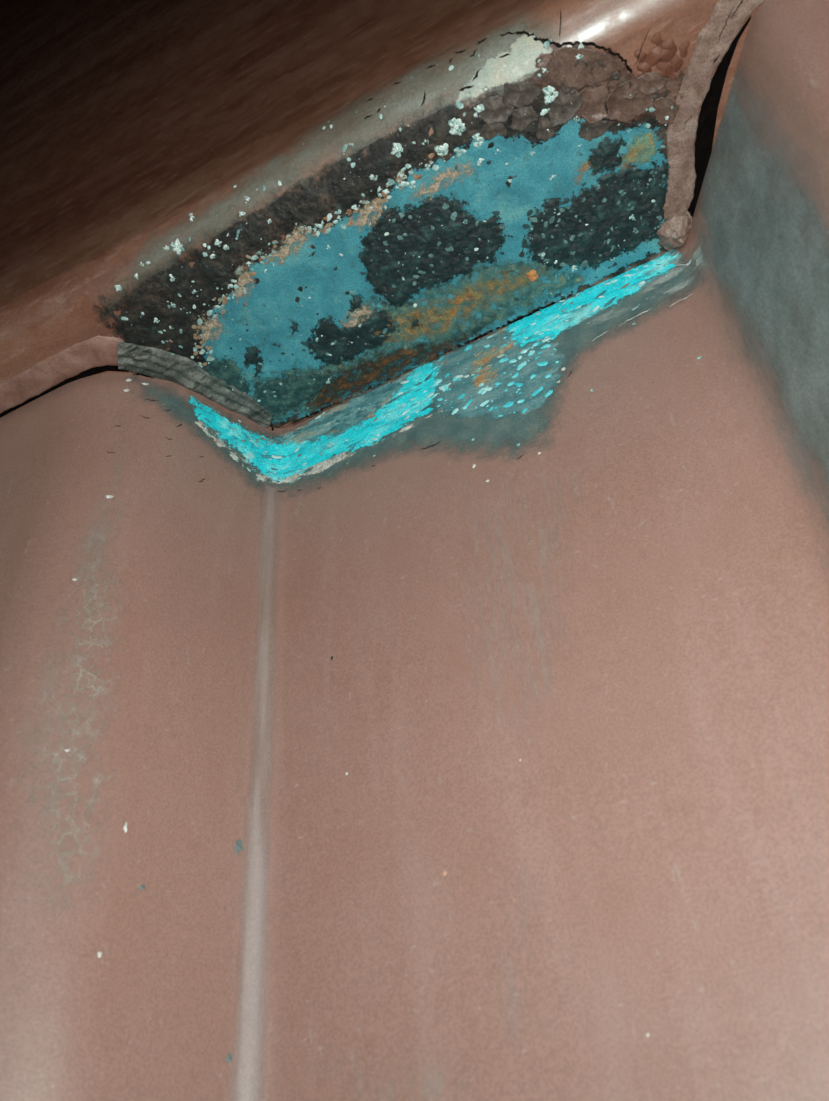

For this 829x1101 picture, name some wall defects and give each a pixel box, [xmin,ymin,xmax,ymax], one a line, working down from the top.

rust [350,201,383,229]
rust [271,227,312,264]
rust [235,266,255,305]
rust [199,318,222,340]
rust [306,276,528,410]
peeling [96,23,698,1101]